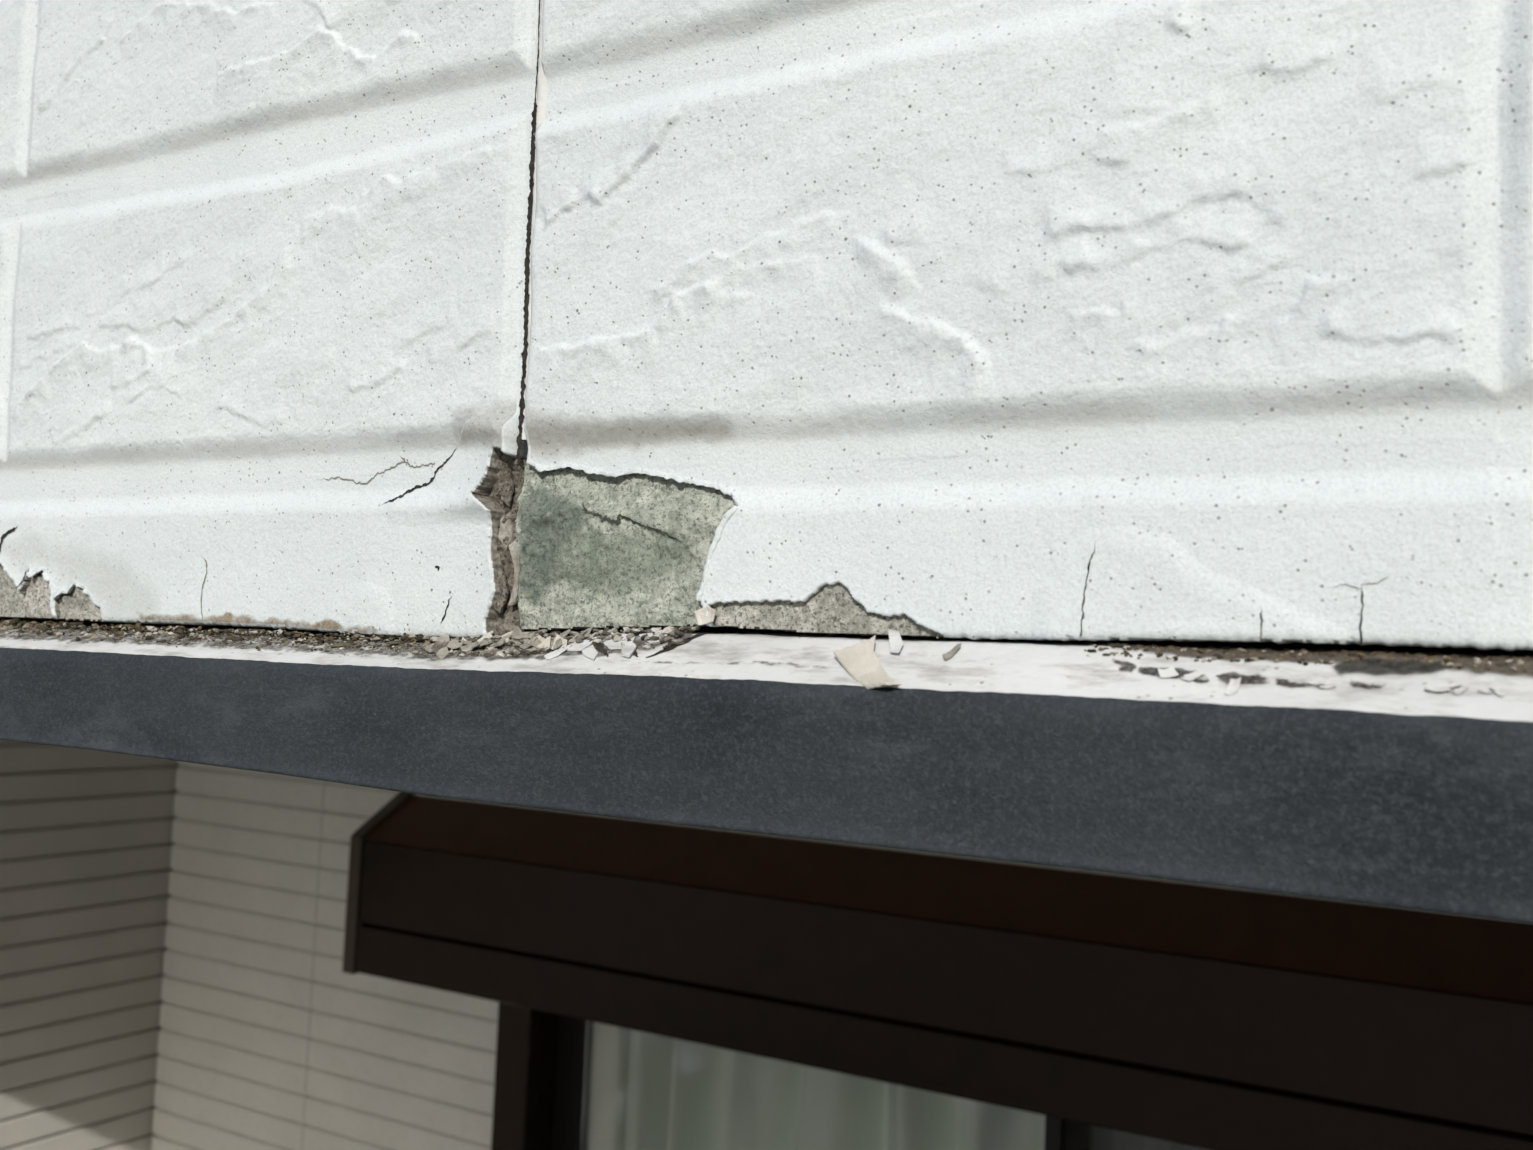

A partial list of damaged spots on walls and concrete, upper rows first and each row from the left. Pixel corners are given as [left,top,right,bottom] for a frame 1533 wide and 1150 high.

crack [516,0,540,462]
crack [323,449,456,505]
peeling [0,527,103,621]
peeling [489,452,961,660]
peeling [1114,660,1386,695]